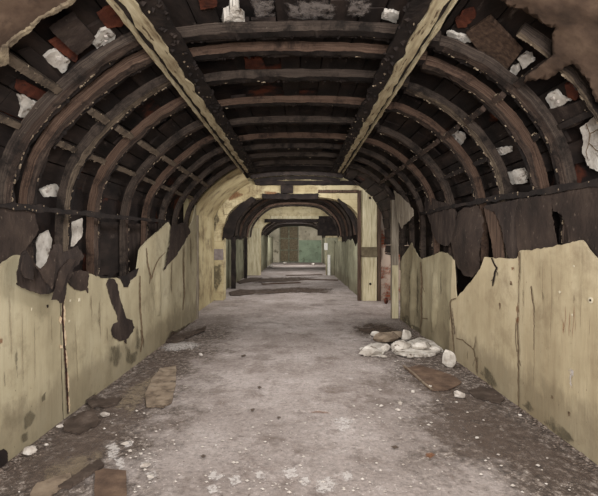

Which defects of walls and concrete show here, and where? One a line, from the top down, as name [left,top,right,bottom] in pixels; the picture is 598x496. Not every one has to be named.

peeling [0,0,76,67]
flaking render [43,48,70,73]
flaking render [510,51,536,75]
flaking render [545,89,572,108]
flaking render [71,218,83,247]
flaking render [36,230,52,268]
spalling [68,270,89,302]
crack [490,258,498,286]
spalling [99,268,139,344]